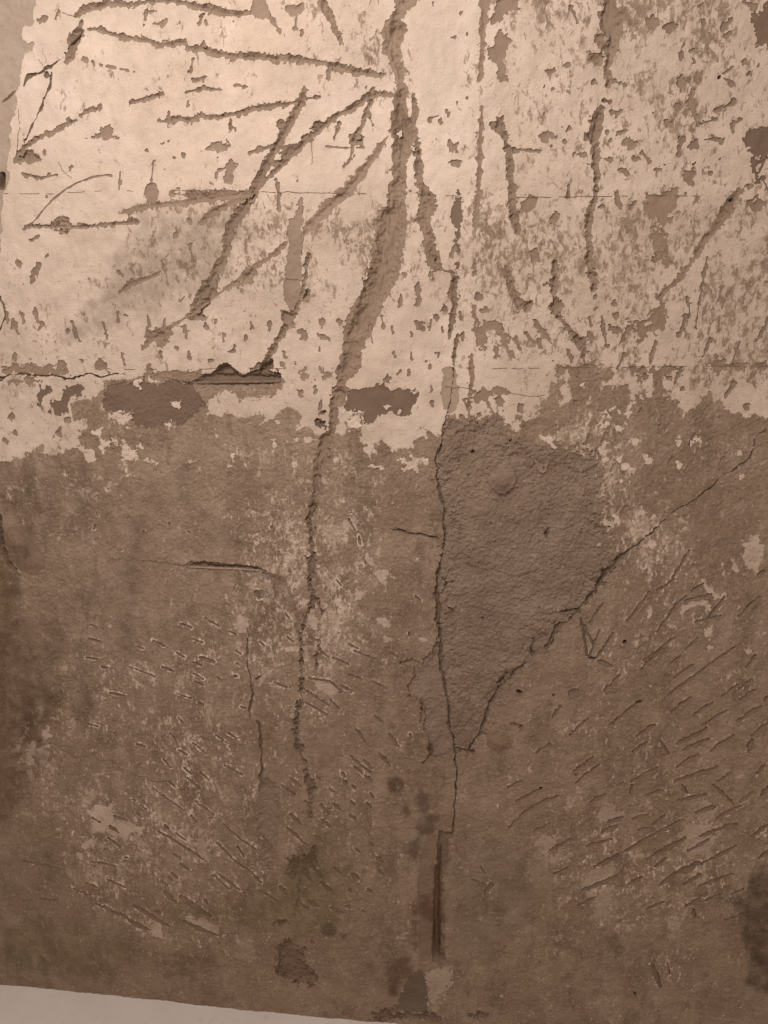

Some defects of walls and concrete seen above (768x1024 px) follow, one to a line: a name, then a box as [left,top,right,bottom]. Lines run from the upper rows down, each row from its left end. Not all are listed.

peeling [487,0,520,83]
peeling [0,0,61,252]
peeling [144,118,239,204]
peeling [598,43,760,273]
crack [0,368,157,381]
crack [183,367,285,385]
peeling [141,280,343,382]
peeling [410,292,552,359]
peeling [586,256,709,402]
crack [291,503,325,818]
spalling [383,349,630,757]
crack [392,365,767,834]